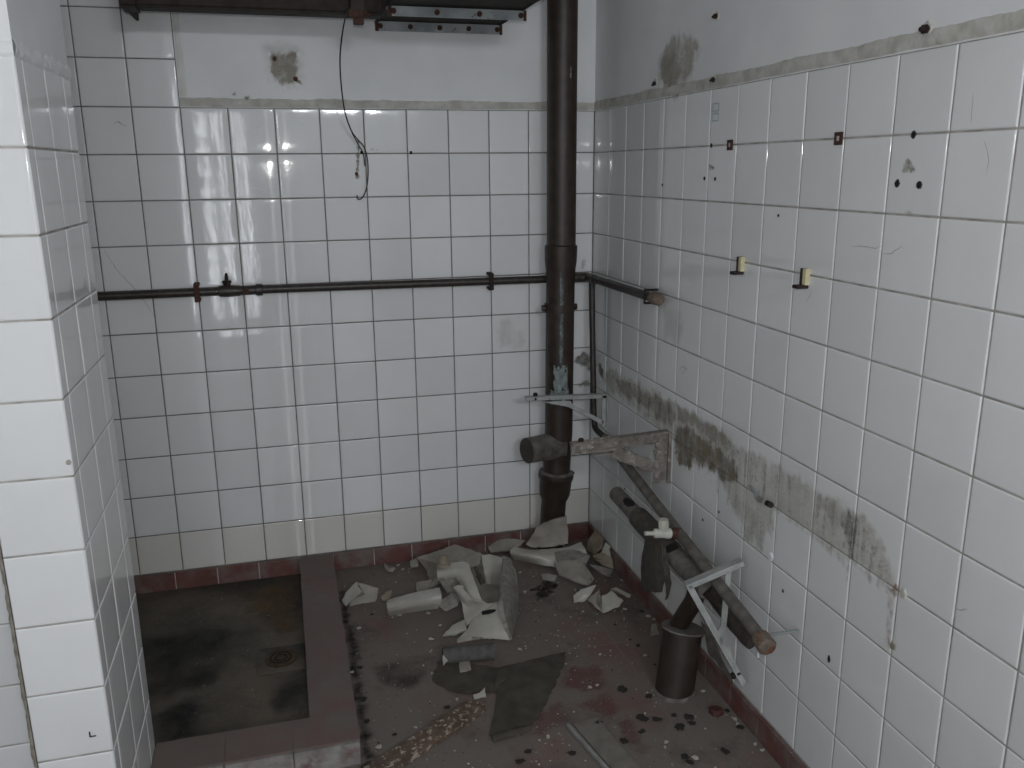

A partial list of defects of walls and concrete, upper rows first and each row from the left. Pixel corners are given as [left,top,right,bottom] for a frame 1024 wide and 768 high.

peeling [267,50,302,90]
water stain [661,37,697,95]
water stain [676,410,753,481]